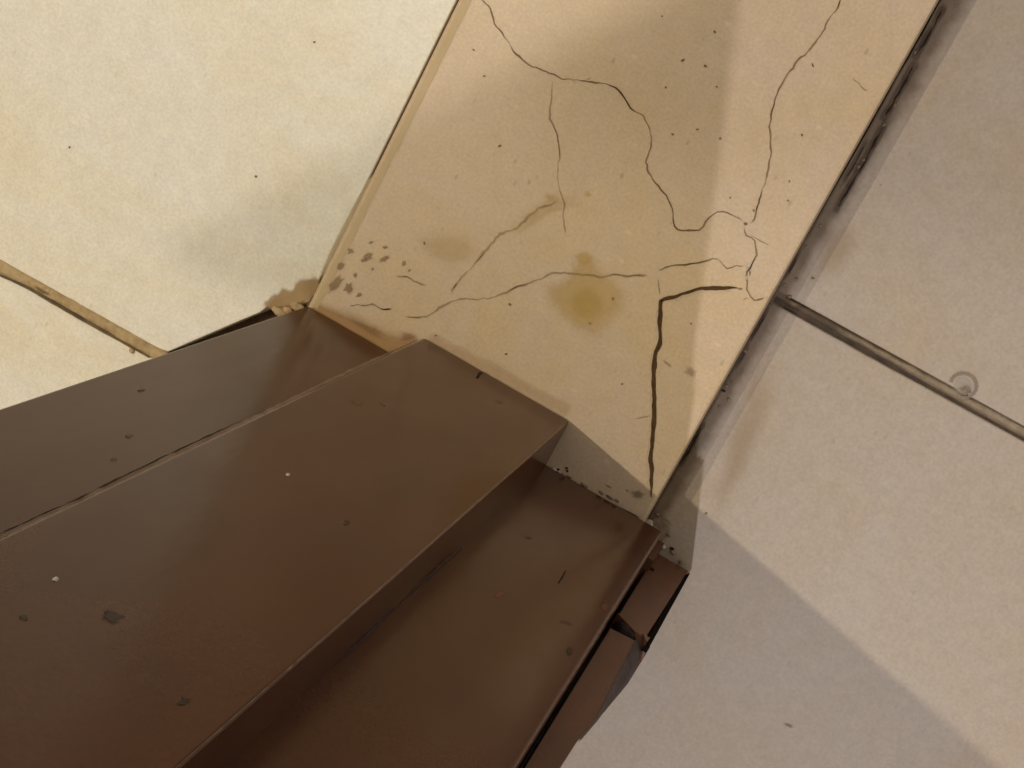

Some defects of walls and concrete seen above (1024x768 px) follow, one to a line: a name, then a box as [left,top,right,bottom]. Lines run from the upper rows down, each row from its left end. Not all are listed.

crack [353,0,840,497]